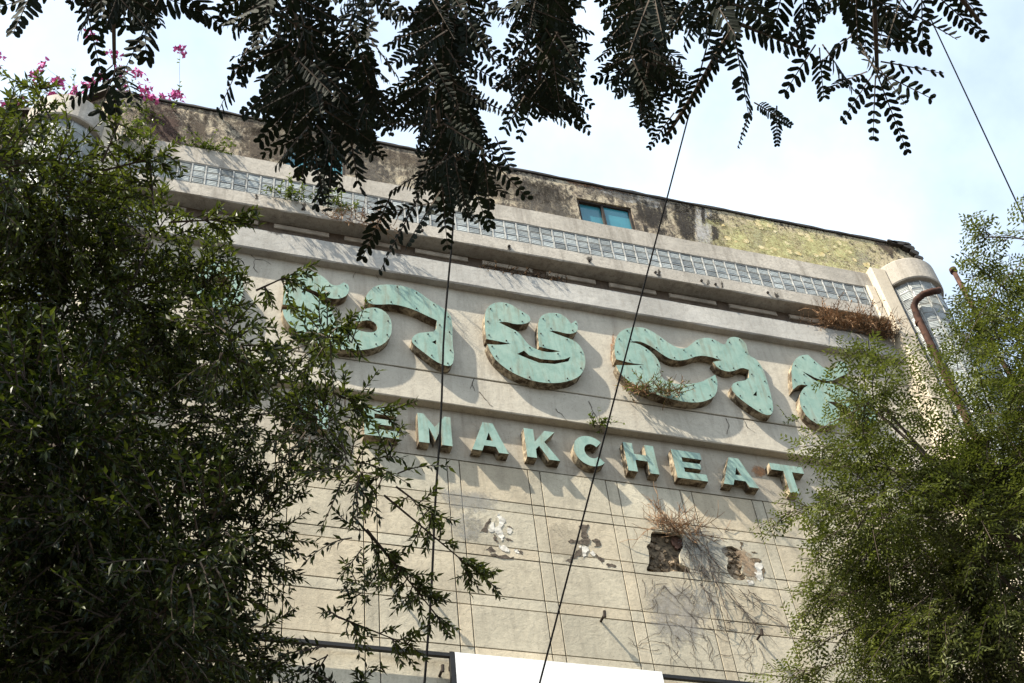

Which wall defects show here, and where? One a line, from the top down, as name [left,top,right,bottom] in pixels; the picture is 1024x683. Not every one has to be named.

leakage [182,110,287,161]
leakage [342,141,444,193]
leakage [487,177,571,217]
leakage [588,188,723,244]
leakage [855,242,896,268]
spalling [480,513,523,559]
spalling [566,524,616,567]
spalling [647,533,688,573]
spalling [722,542,765,585]